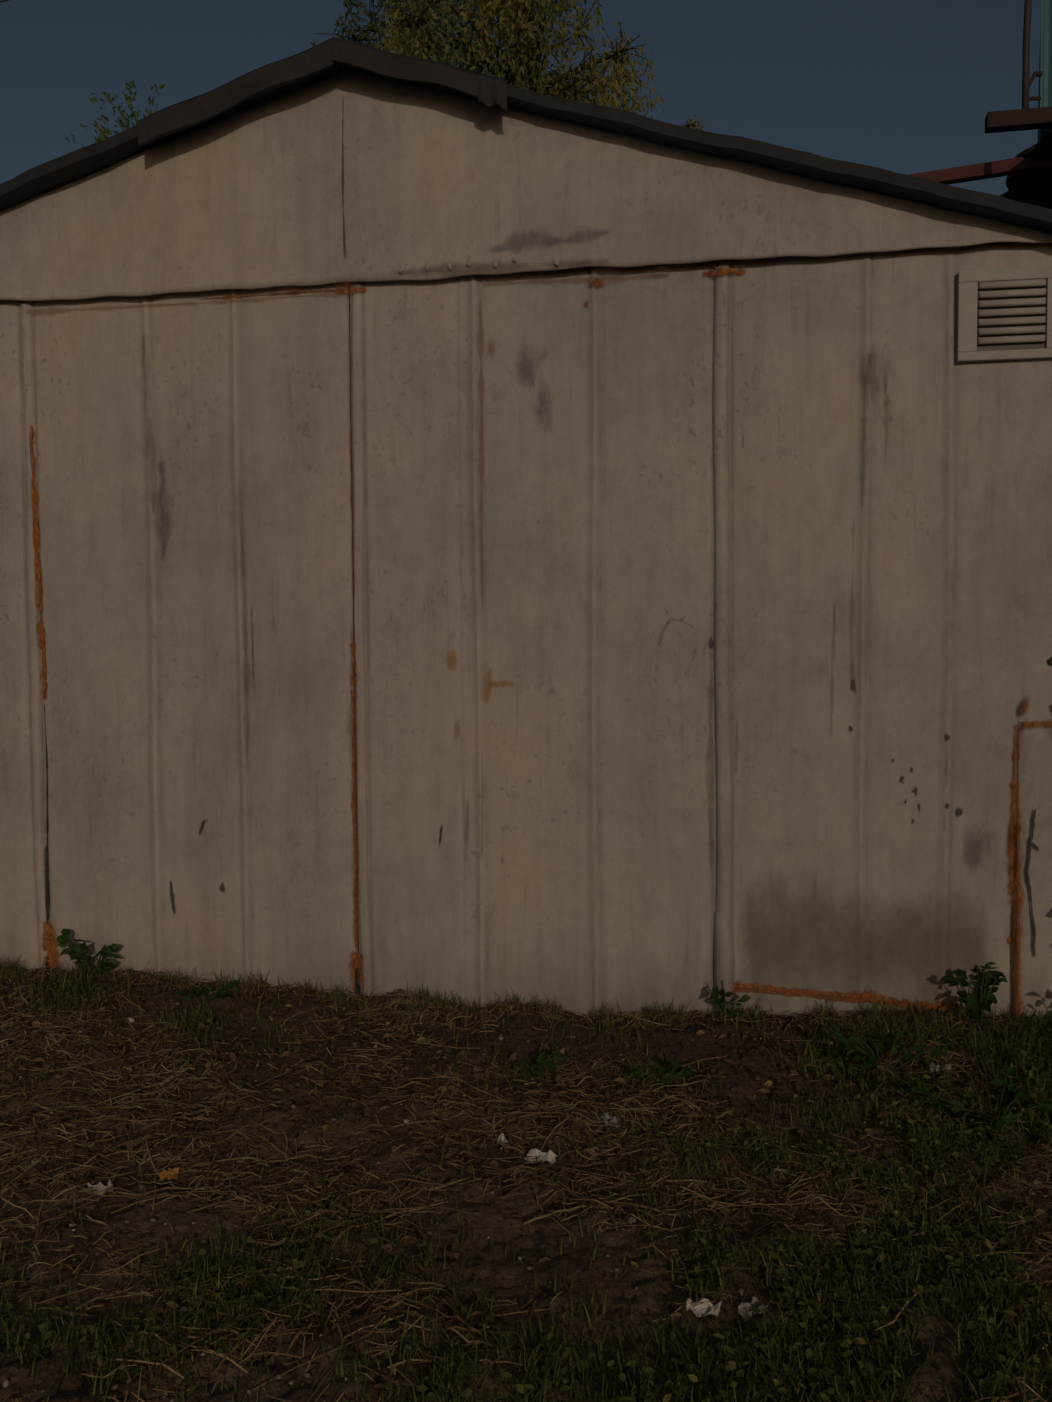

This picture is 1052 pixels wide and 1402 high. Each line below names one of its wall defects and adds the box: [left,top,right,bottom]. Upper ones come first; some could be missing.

rust [29,426,47,699]
rust [335,283,366,995]
rust [42,922,59,971]
rust [732,982,960,1012]
rust [1007,699,1052,1020]